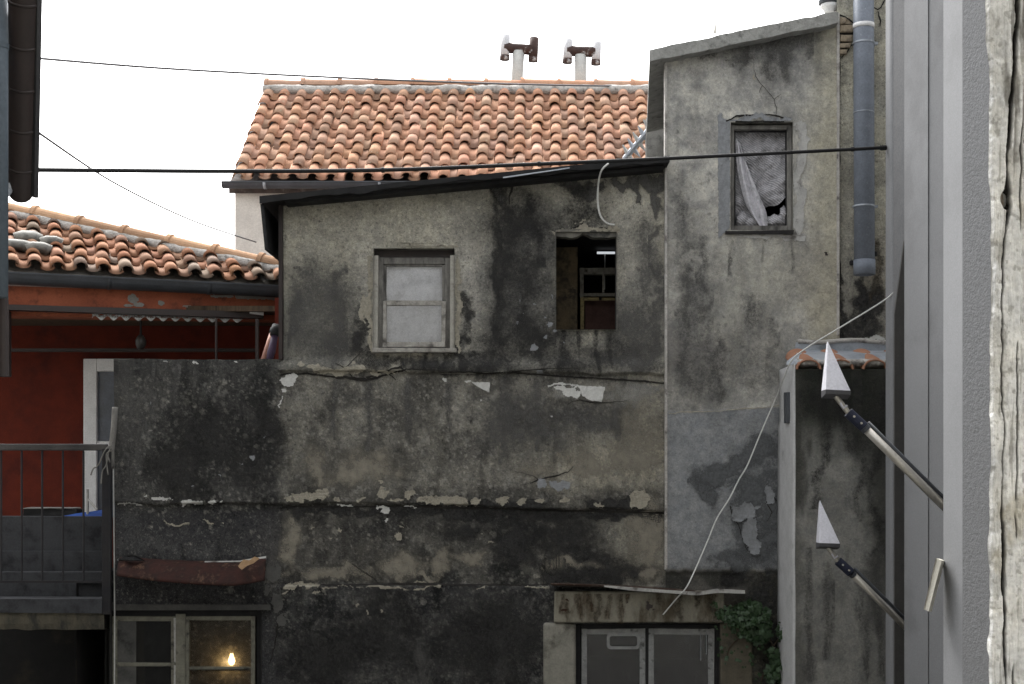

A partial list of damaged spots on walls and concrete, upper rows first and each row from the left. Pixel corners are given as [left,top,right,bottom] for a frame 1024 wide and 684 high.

crack [726,57,792,123]
peeling [358,256,374,354]
peeling [402,243,463,353]
water stain [287,171,713,464]
water stain [117,361,284,507]
peeling [278,361,398,408]
crack [280,350,664,405]
peeling [465,380,490,401]
peeling [548,382,605,402]
crack [284,466,664,520]
water stain [278,480,662,623]
water stain [674,431,778,679]